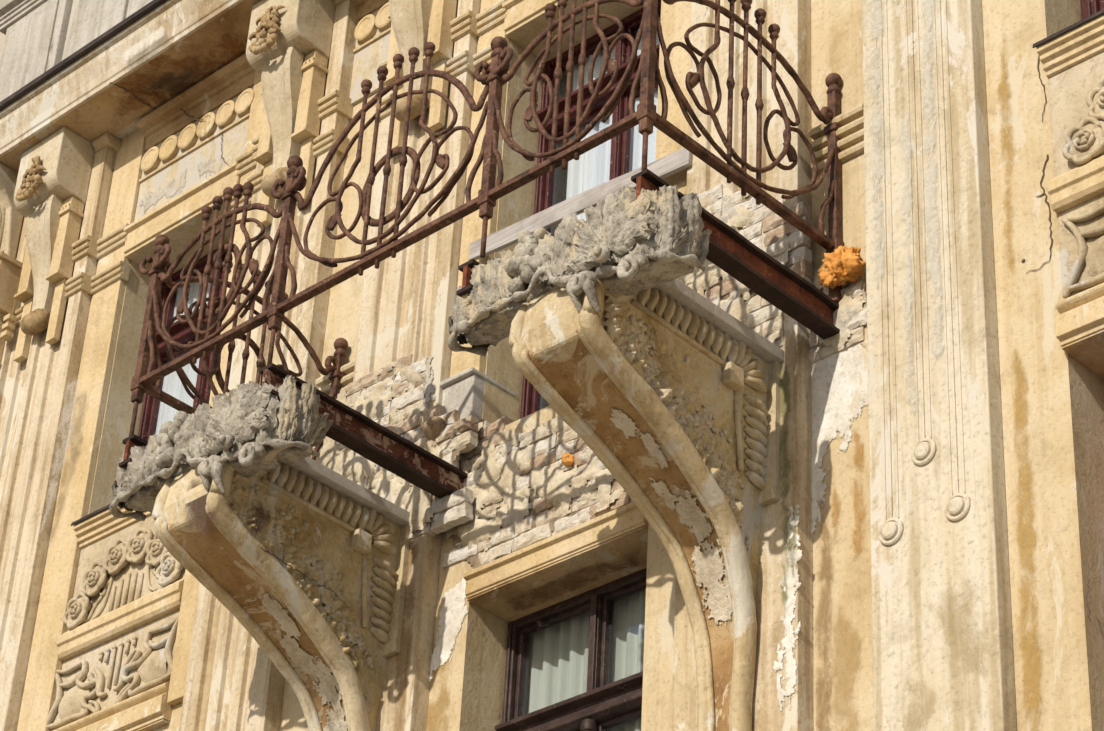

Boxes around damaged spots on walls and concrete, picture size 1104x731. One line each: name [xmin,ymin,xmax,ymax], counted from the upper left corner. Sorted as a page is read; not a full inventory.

damp [125,28,163,61]
damp [120,34,247,115]
crack [1037,55,1047,121]
crack [1028,154,1053,272]
flaking render [677,259,784,347]
peeling [697,184,868,535]
damp [1014,356,1027,427]
flaking render [317,354,631,569]
damp [1018,454,1035,571]
peeling [430,576,468,681]
peeling [773,504,802,711]
damp [1020,588,1040,731]